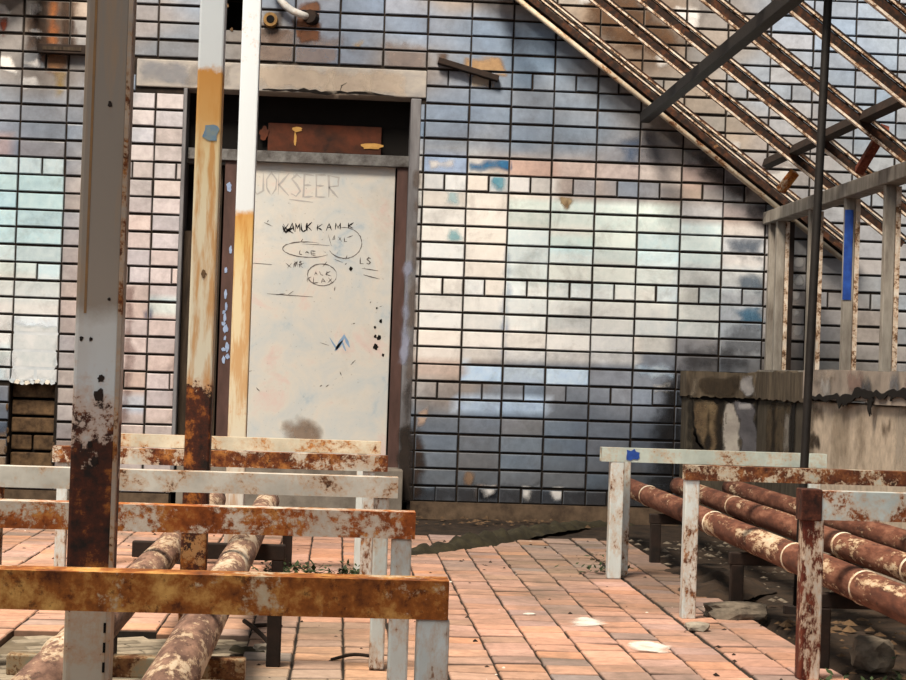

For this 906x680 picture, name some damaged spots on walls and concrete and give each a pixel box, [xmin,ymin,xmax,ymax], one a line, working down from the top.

corrosion [94,375,104,401]
damp [285,421,319,439]